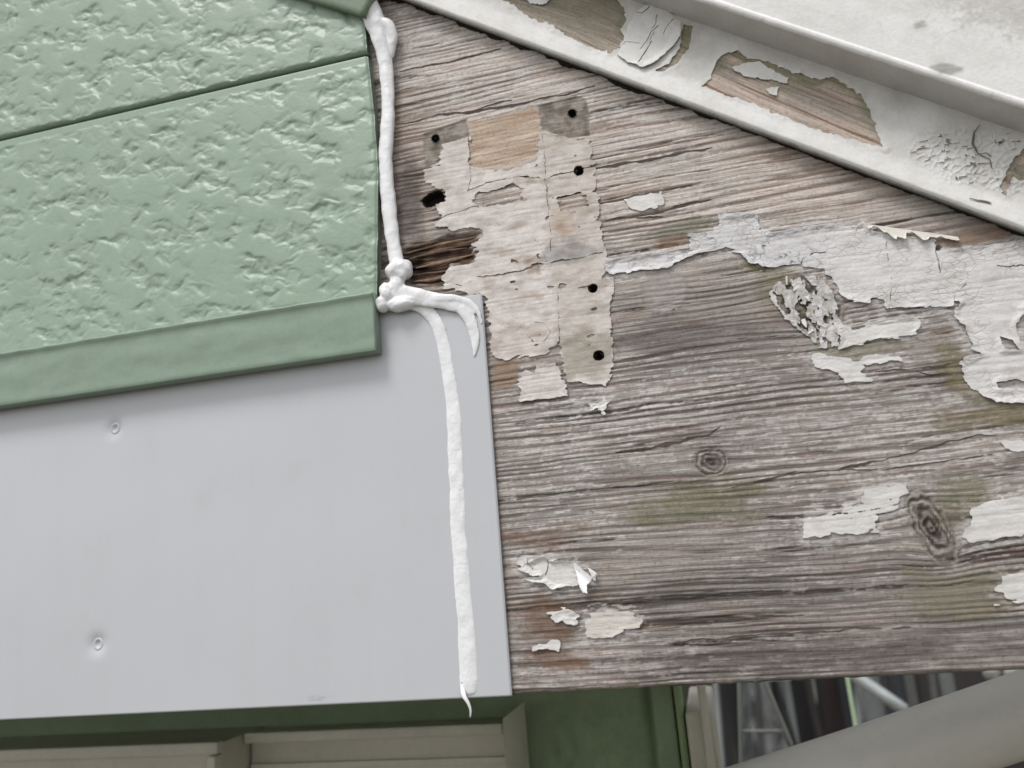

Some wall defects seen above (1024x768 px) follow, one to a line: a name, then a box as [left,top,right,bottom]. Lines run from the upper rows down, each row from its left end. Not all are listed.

peeling [503,0,693,72]
peeling [702,51,882,147]
crack [913,125,1022,203]
peeling [423,132,1024,415]
peeling [802,483,909,538]
peeling [962,497,1024,543]
peeling [516,555,597,593]
peeling [994,573,1024,606]
peeling [532,639,561,652]
peeling [546,607,643,639]